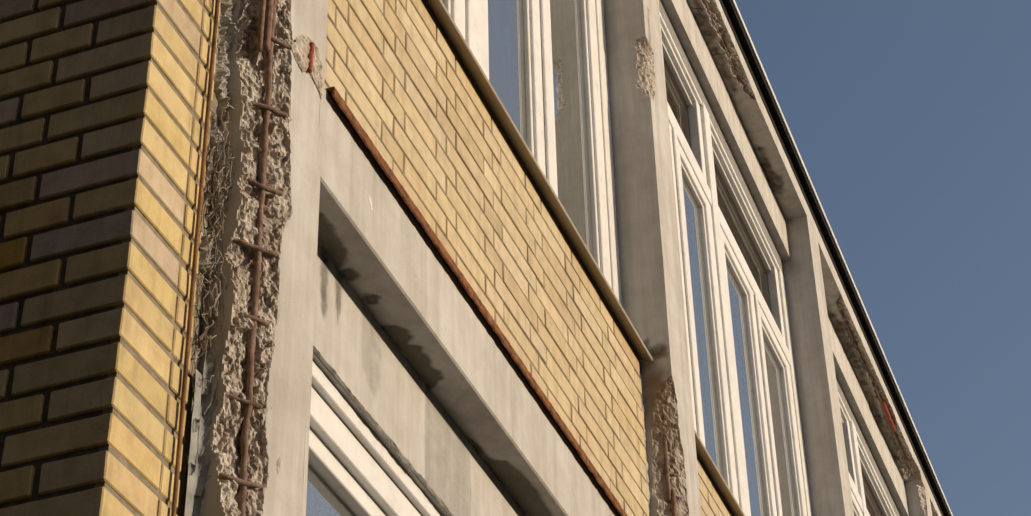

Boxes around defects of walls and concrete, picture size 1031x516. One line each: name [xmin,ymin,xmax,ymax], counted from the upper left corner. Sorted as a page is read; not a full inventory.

spalling [635,36,656,101]
spalling [184,0,323,516]
leakage [318,213,358,313]
leakage [382,326,443,389]
spalling [651,376,689,516]
spalling [835,294,938,516]